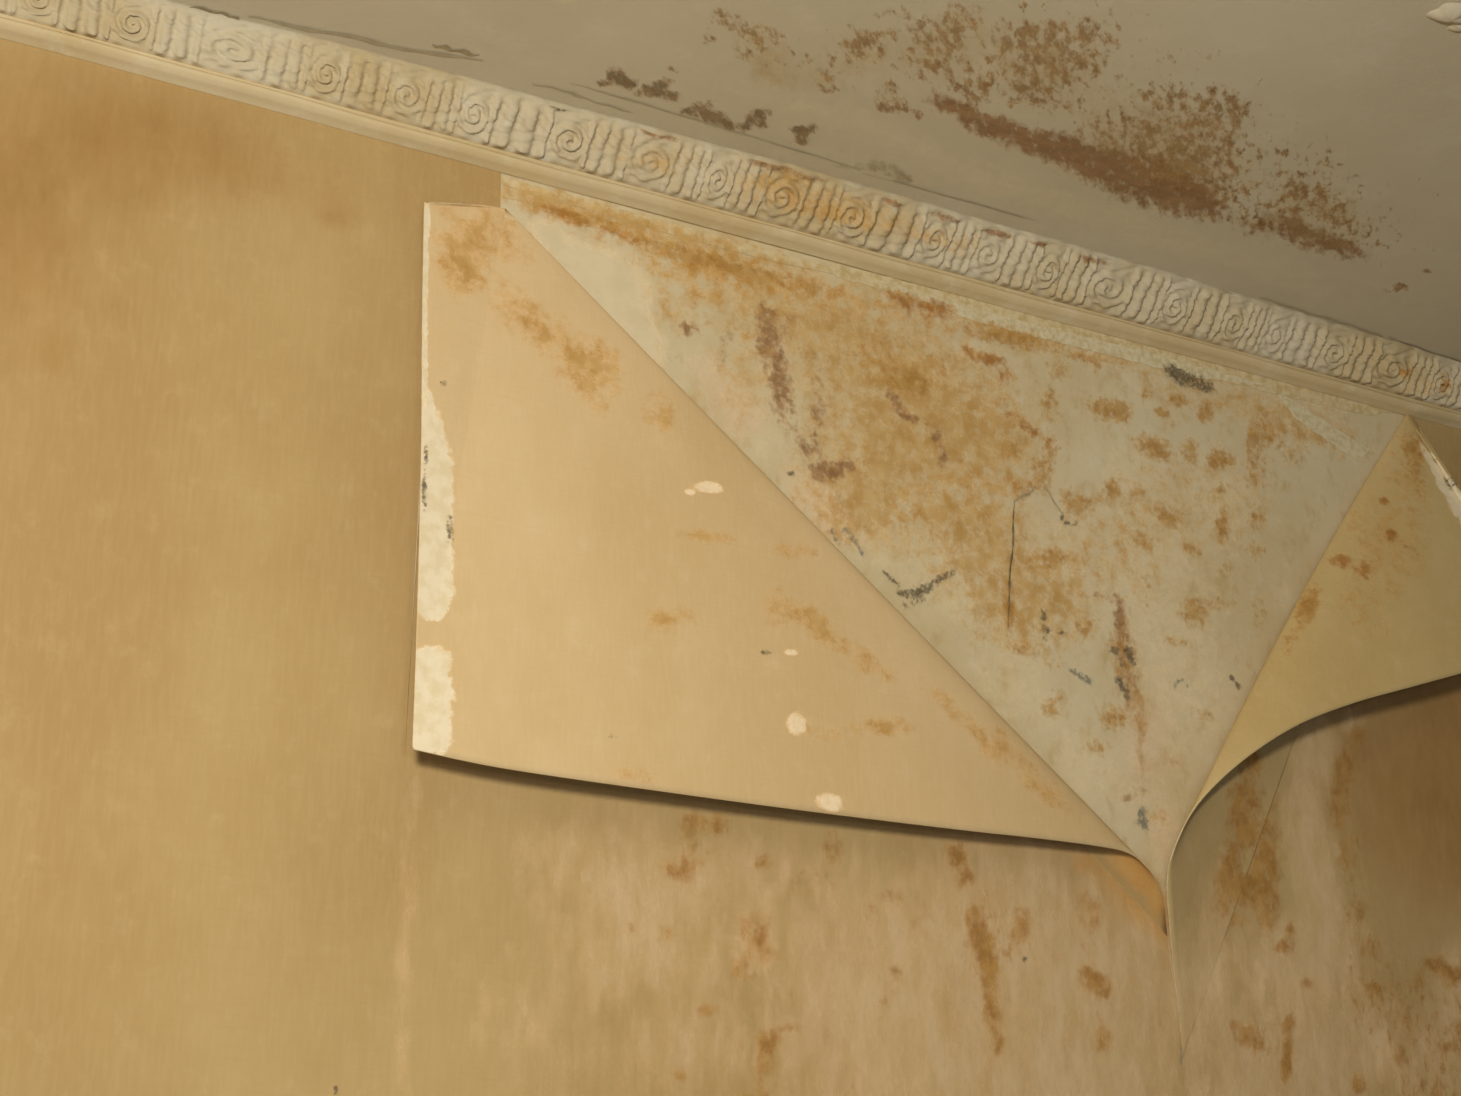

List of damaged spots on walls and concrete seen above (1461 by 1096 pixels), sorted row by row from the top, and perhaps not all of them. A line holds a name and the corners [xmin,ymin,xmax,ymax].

mould [598,67,766,130]
mould [792,126,814,145]
mould [821,4,1370,257]
damp [441,213,497,289]
flaking render [535,224,660,361]
damp [520,184,1091,652]
damp [1094,398,1129,421]
damp [1143,364,1221,423]
damp [1140,395,1322,483]
damp [1220,738,1352,991]
damp [826,895,1139,1096]